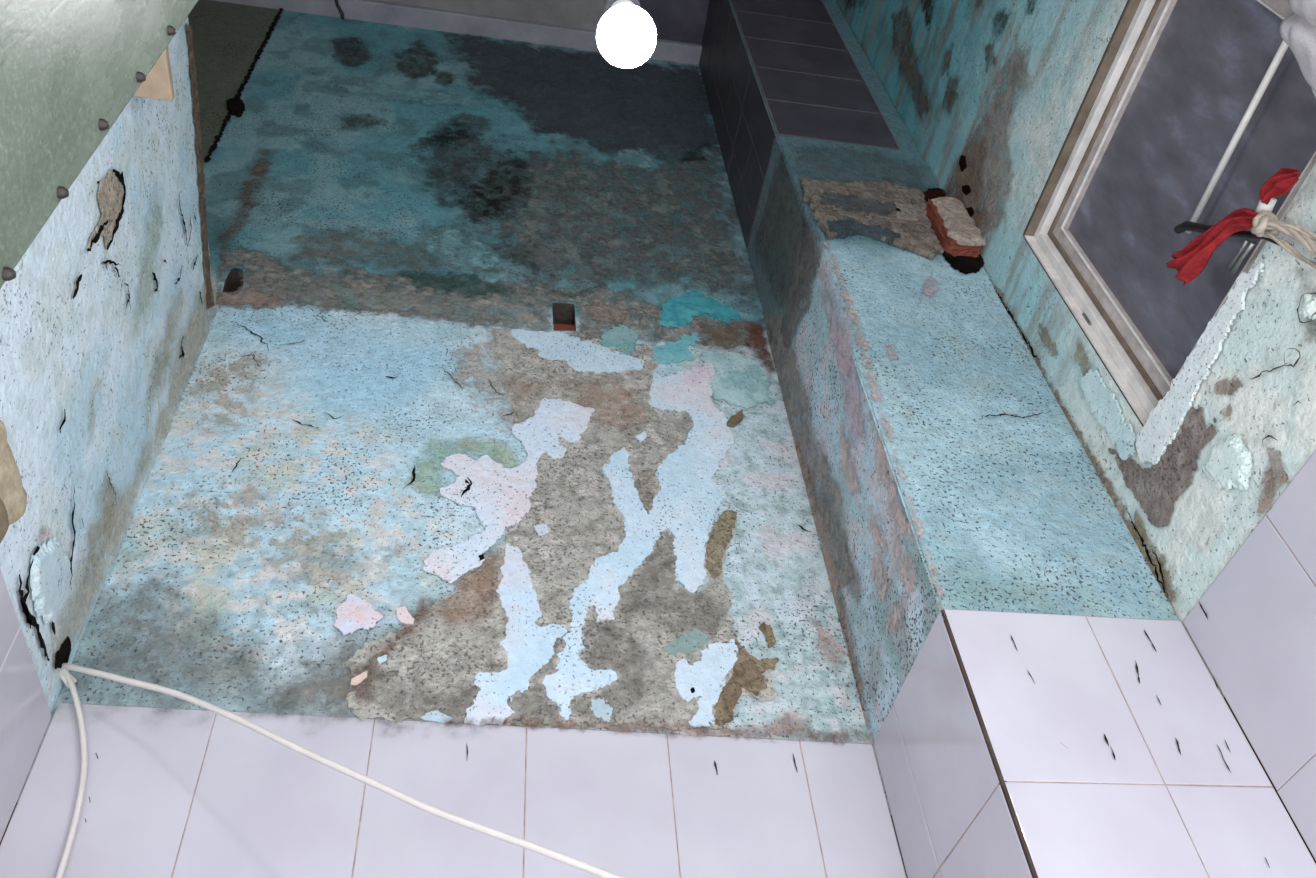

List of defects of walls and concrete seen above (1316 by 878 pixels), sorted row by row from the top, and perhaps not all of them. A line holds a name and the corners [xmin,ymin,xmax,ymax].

water stain [892,0,958,121]
water stain [985,9,1008,72]
spalling [86,169,126,251]
peeling [183,23,779,737]
water stain [277,34,926,728]
peeling [800,177,1264,637]
peeling [1257,448,1288,513]